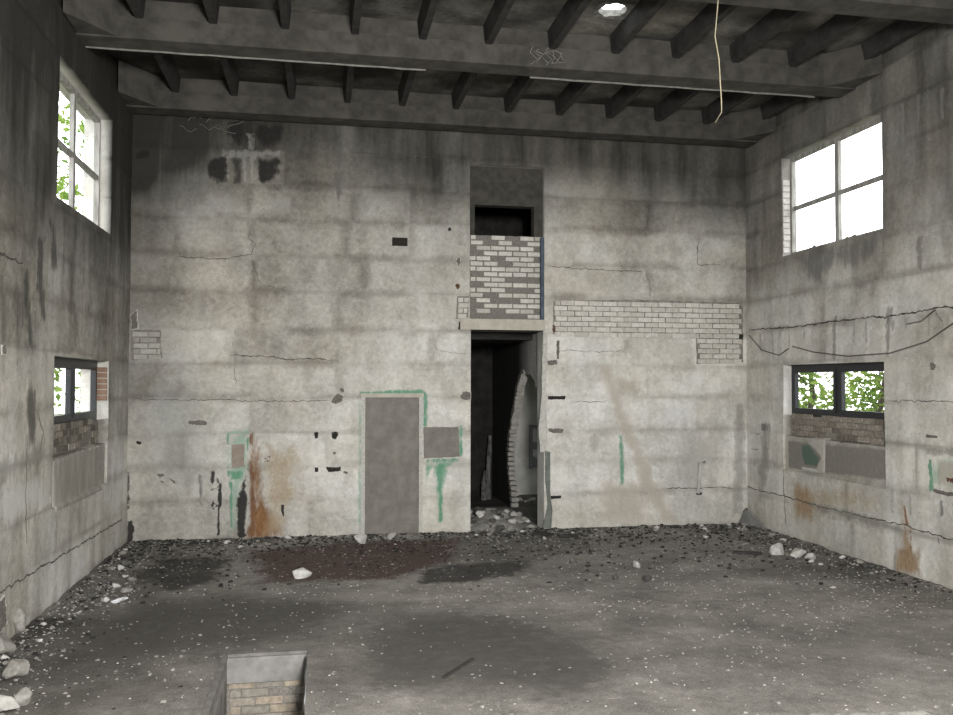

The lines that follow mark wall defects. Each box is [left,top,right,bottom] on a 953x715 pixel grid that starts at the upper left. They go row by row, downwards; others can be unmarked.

crack [751,305,953,330]
crack [0,520,121,593]
corrosion [240,420,470,586]
crack [663,471,953,541]
corrosion [893,497,926,580]